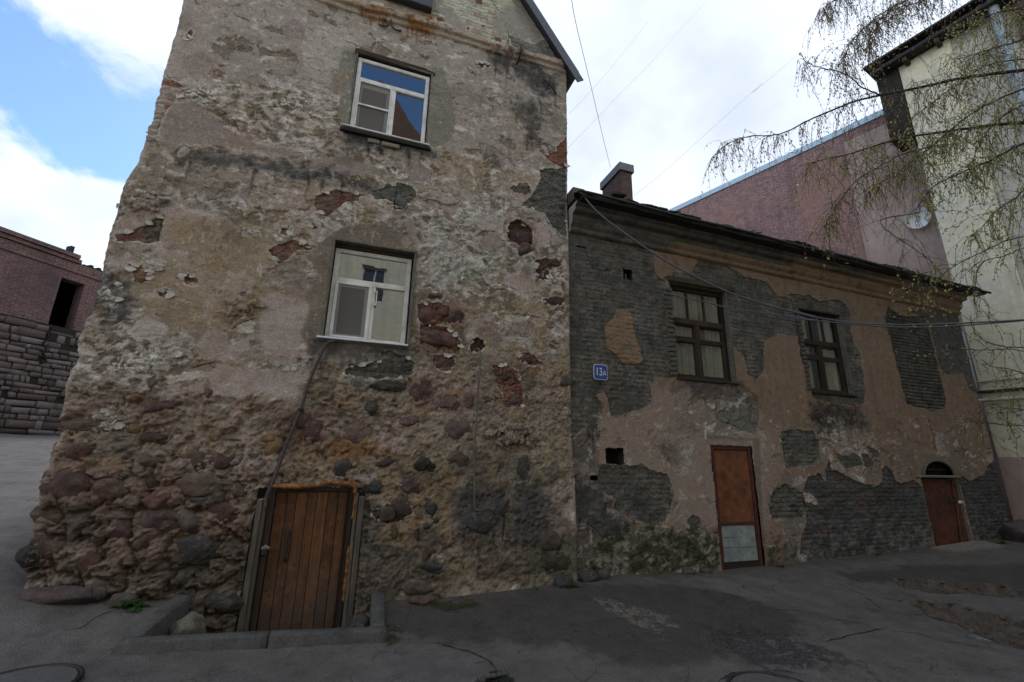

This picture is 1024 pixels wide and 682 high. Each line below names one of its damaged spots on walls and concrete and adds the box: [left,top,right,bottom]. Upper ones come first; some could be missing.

spalling [115,215,164,243]
spalling [235,225,311,263]
peeling [308,159,492,229]
spalling [505,220,532,245]
flaking render [510,137,866,438]
spalling [418,301,486,371]
spalling [492,352,544,408]
flaking render [885,307,989,414]
flaking render [589,447,674,526]
flaking render [768,430,935,561]
flaking render [958,461,1010,541]